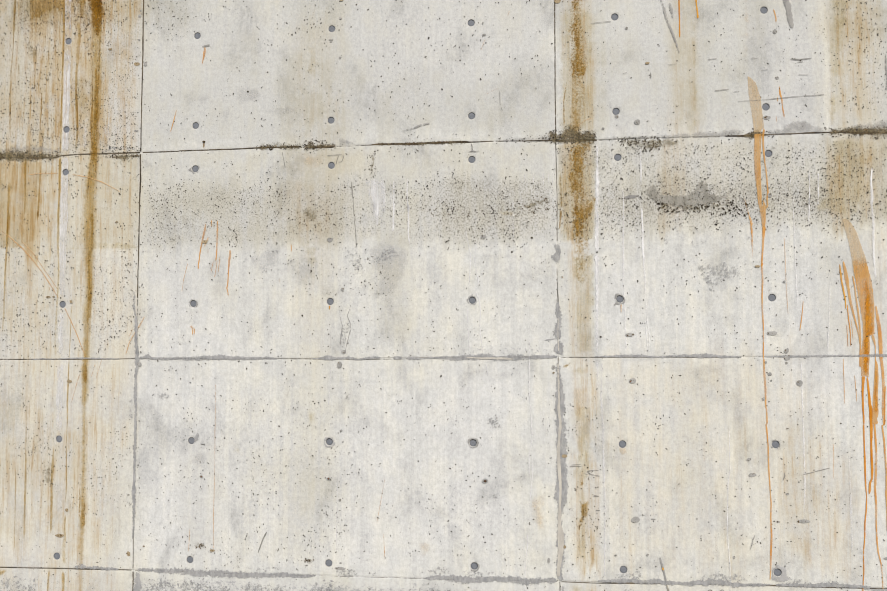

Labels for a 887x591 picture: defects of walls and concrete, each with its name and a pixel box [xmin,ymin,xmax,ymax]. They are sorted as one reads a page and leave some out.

corrosion [80,0,102,35]
water stain [367,141,466,230]
corrosion [560,148,595,245]
water stain [623,182,754,218]
corrosion [748,77,769,269]
corrosion [795,150,887,591]
corrosion [765,390,773,579]